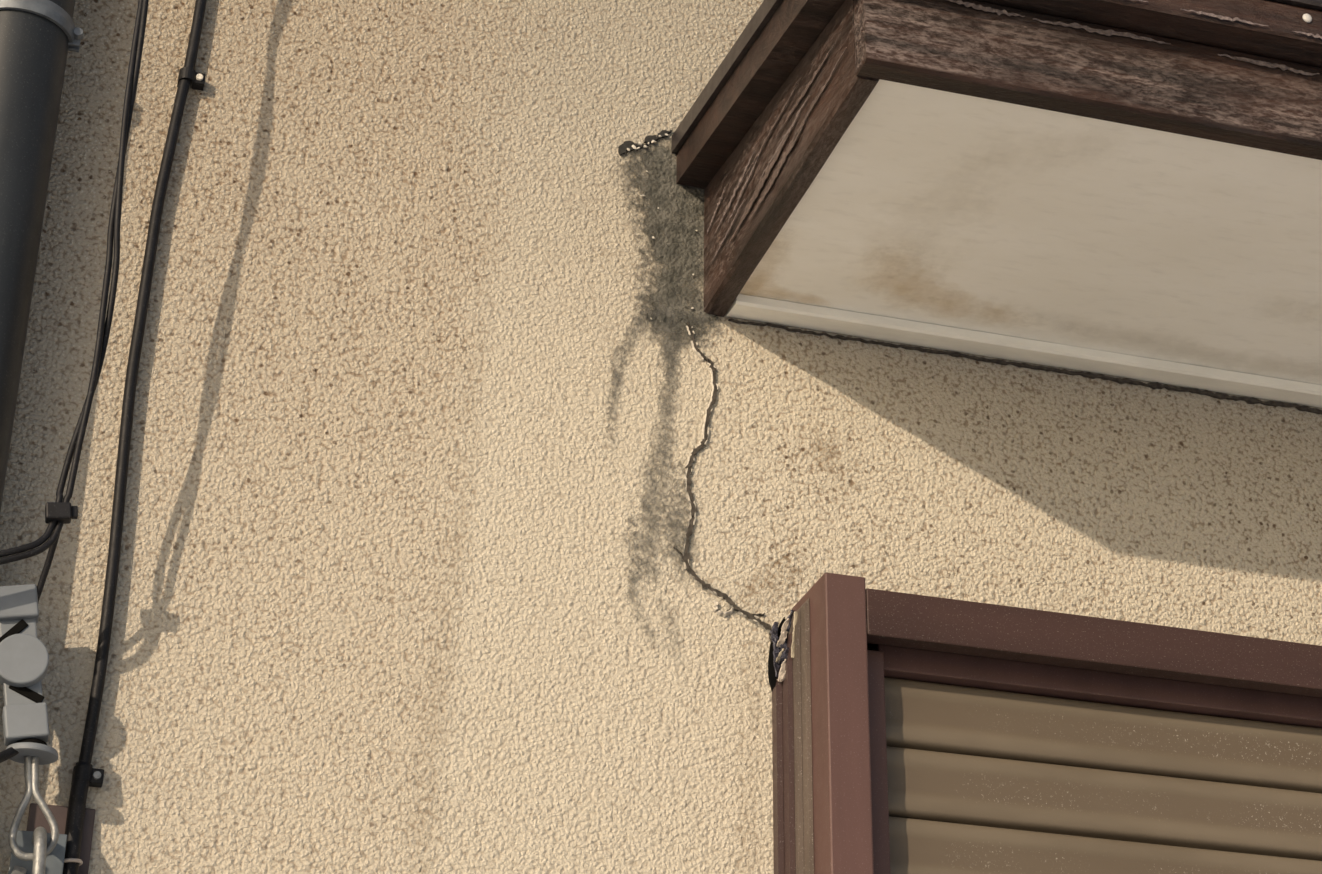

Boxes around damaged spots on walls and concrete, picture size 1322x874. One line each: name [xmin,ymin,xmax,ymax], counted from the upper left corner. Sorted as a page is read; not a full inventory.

damp [609,138,721,596]
crack [673,322,772,643]